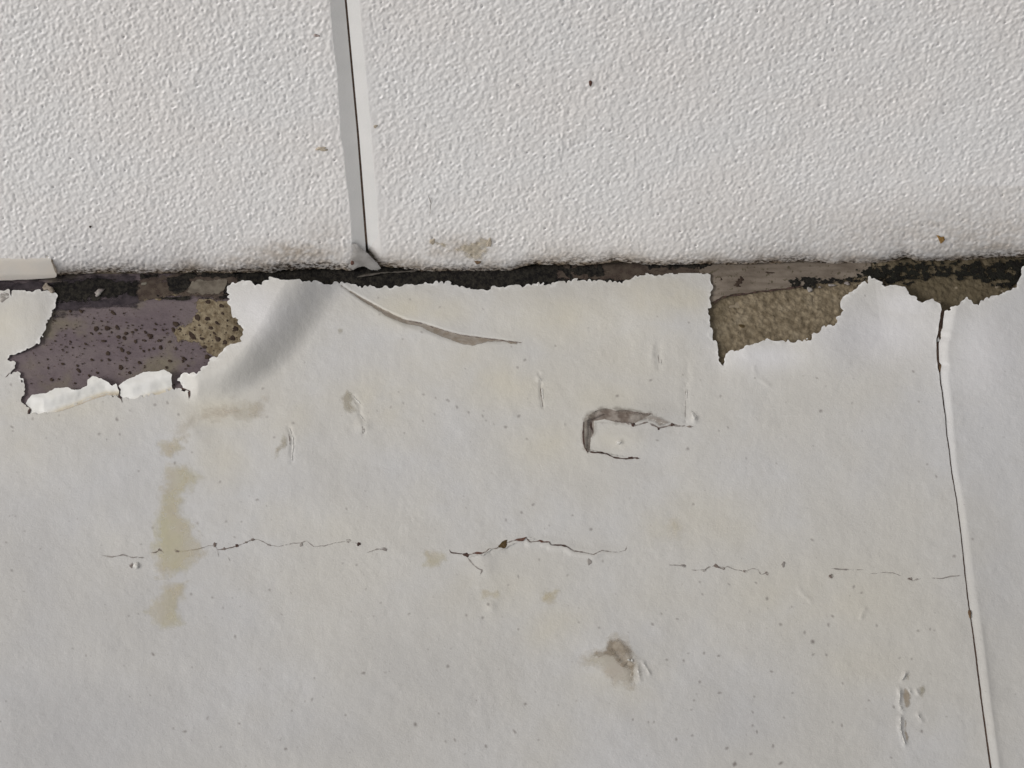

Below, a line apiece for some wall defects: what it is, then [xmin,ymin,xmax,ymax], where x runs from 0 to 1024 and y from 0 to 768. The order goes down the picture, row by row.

peeling [2,273,351,416]
peeling [699,256,1024,365]
crack [102,538,387,569]
crack [449,537,627,574]